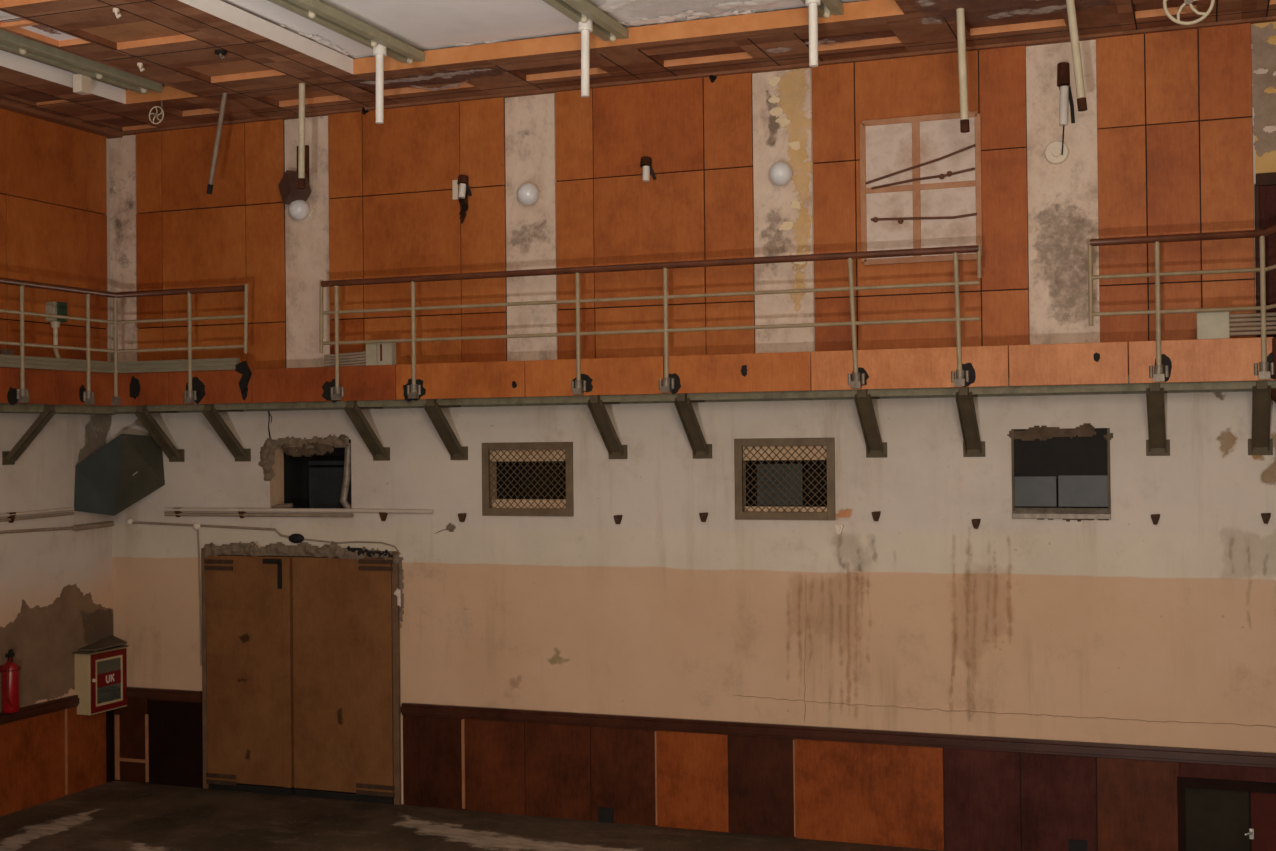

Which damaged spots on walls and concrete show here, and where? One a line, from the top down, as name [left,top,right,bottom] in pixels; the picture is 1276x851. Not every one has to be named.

peeling [1251,24,1276,157]
peeling [767,68,813,310]
spalling [258,434,349,481]
peeling [0,584,114,712]
spalling [204,541,404,628]